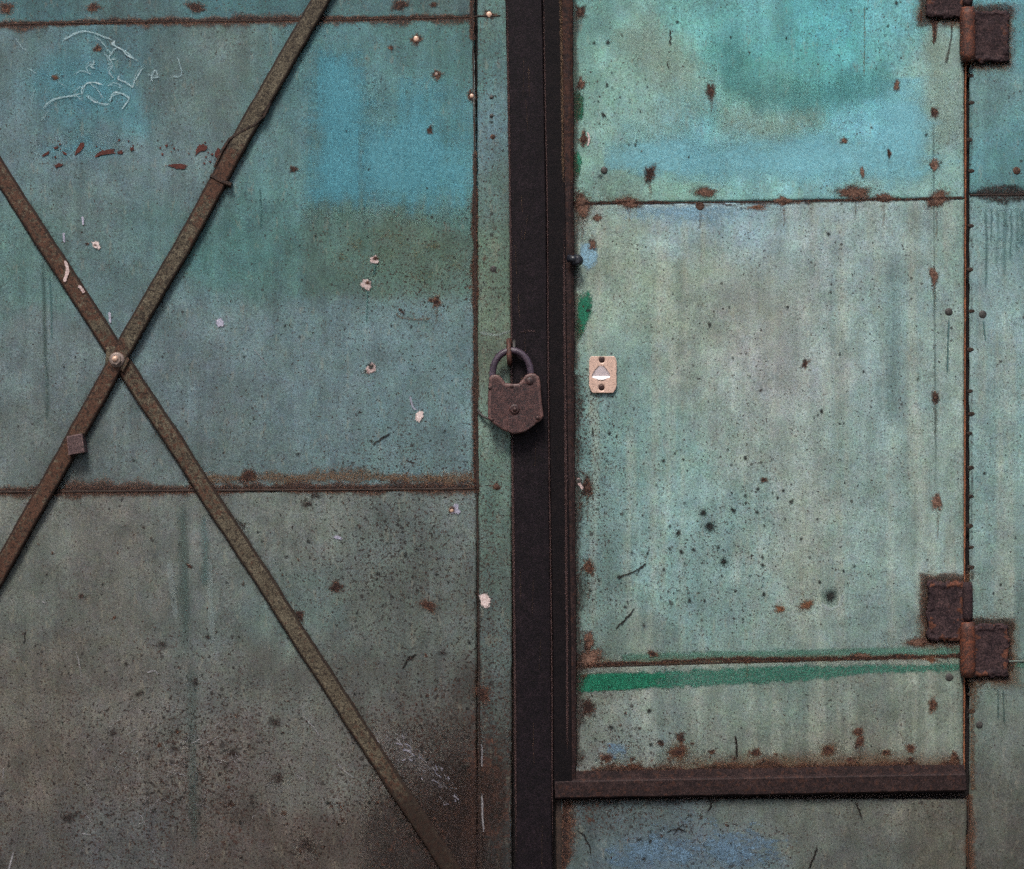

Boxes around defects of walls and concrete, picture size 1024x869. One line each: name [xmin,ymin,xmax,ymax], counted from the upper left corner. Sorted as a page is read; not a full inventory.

rust [544,0,1015,869]
rust [0,486,37,498]
rust [54,479,196,499]
rust [206,151,517,869]
peeling [479,594,491,608]